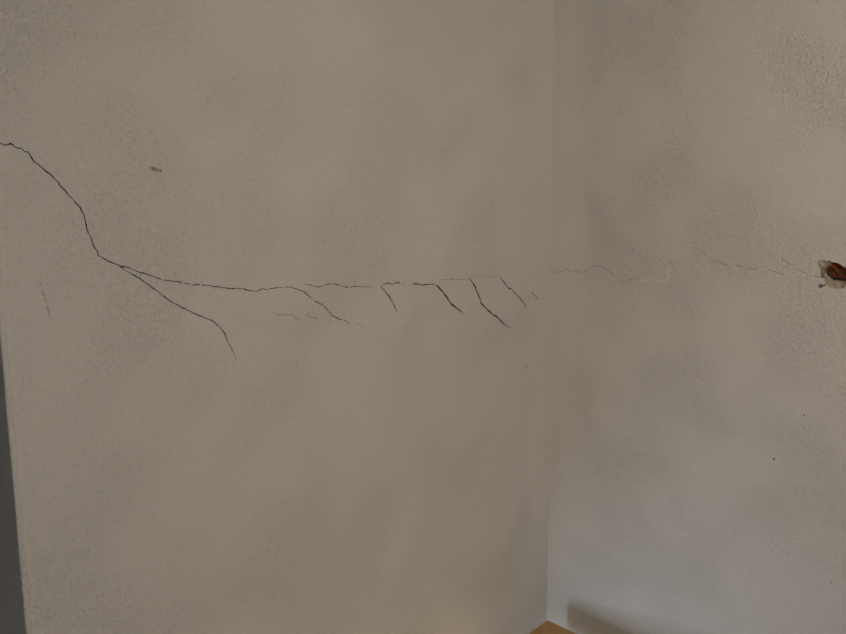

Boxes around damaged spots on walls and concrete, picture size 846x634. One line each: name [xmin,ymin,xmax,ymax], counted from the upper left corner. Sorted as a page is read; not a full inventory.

crack [0,143,539,358]
flaking render [818,260,846,289]